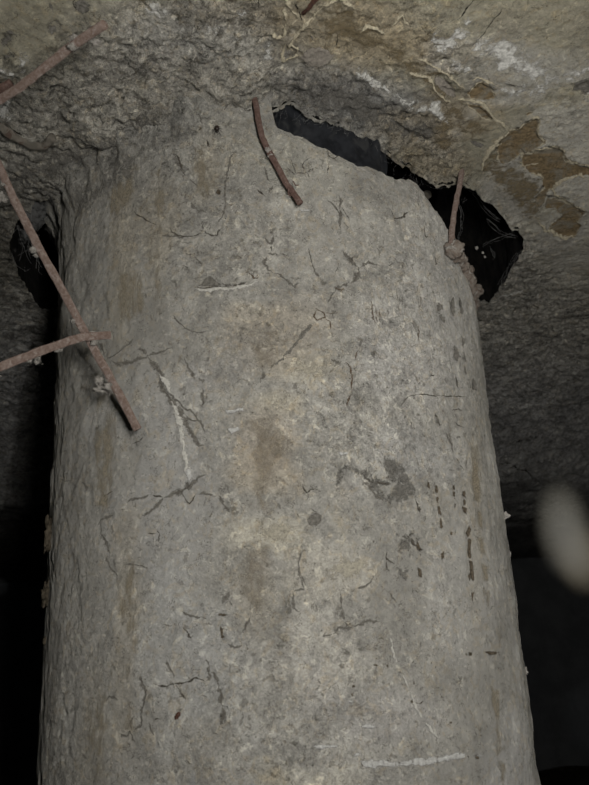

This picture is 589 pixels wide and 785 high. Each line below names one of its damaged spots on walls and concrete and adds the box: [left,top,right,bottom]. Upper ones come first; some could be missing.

water stain [264,0,589,219]
crack [99,339,205,447]